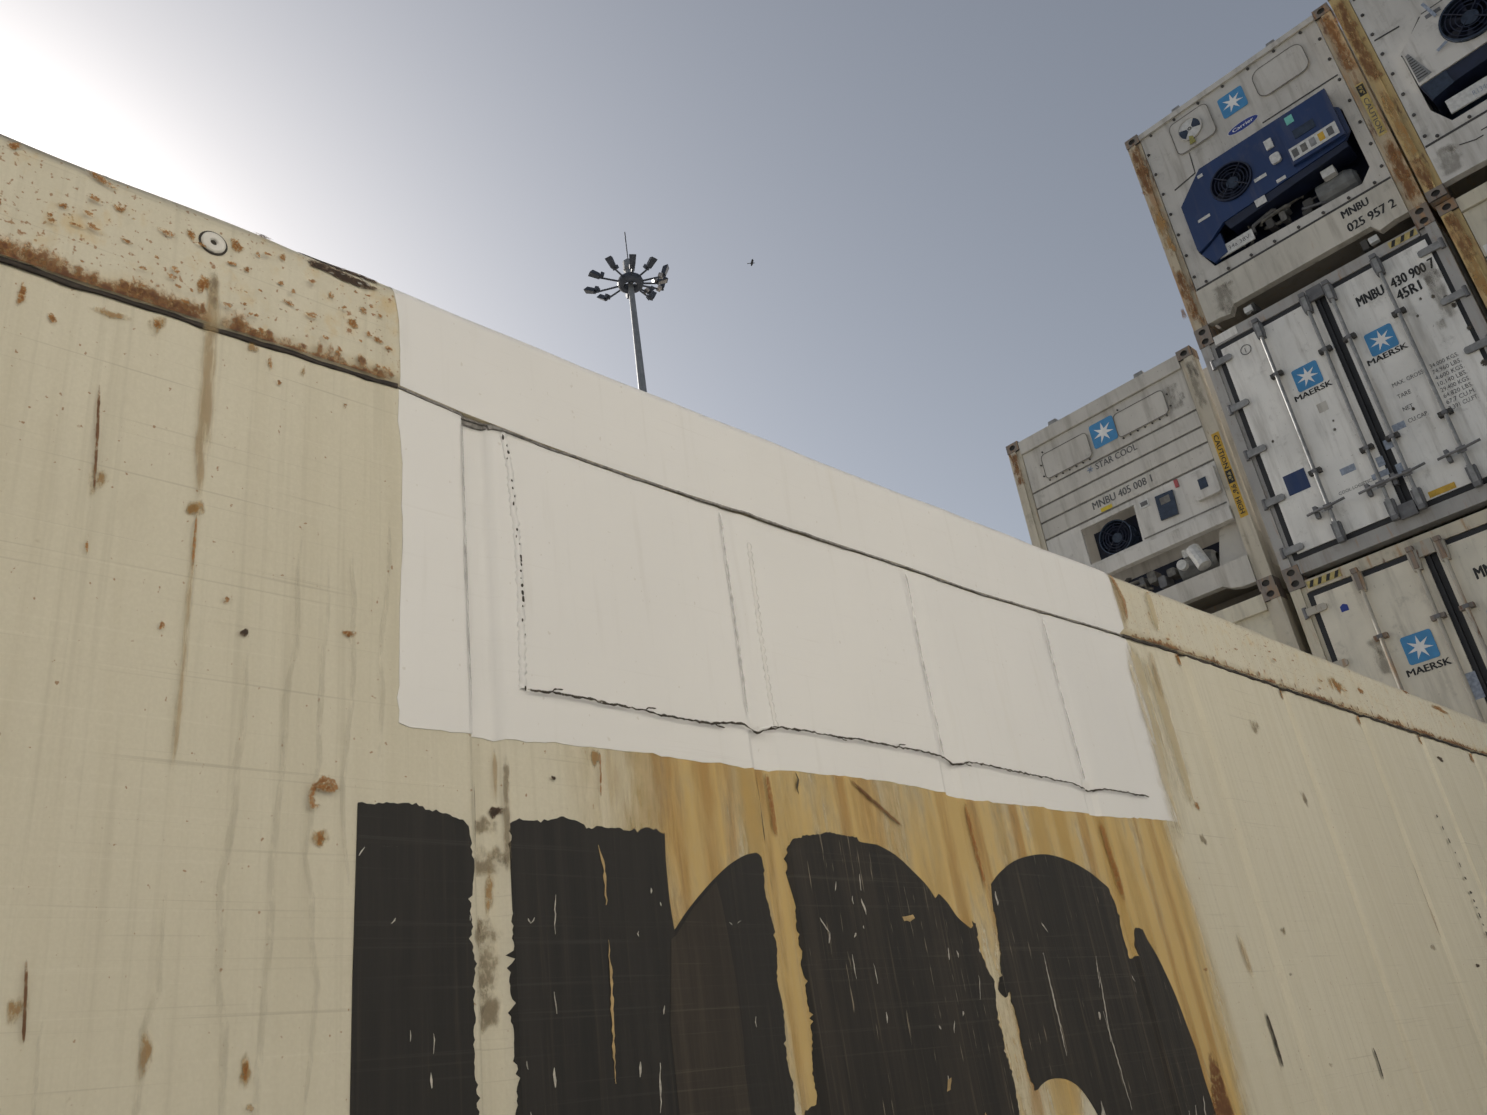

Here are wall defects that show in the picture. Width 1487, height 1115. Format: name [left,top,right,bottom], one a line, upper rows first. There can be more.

corrosion [47,172,135,230]
corrosion [0,234,394,385]
corrosion [187,502,204,565]
corrosion [1132,634,1487,762]
corrosion [591,751,602,795]
corrosion [653,753,1244,1115]
peeling [608,946,616,1082]